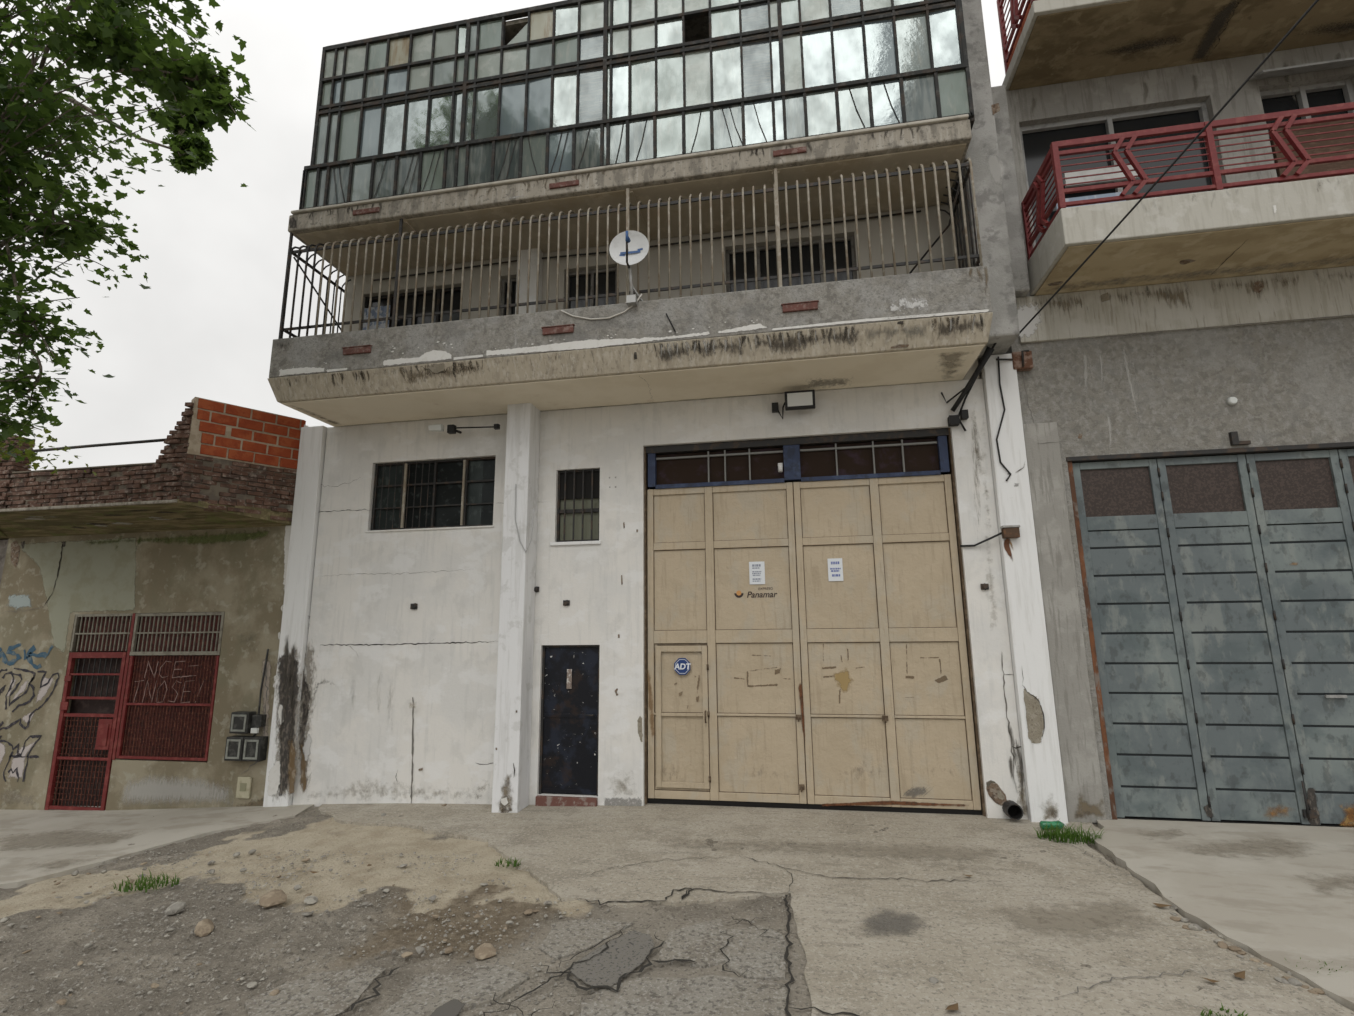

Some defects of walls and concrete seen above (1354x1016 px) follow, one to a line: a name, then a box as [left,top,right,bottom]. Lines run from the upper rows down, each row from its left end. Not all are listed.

leakage [654,315,983,361]
leakage [400,361,483,382]
peeling [8,595,30,609]
crack [2,541,66,614]
peeling [822,644,863,703]
leakage [241,640,316,807]
spalling [1022,671,1045,743]